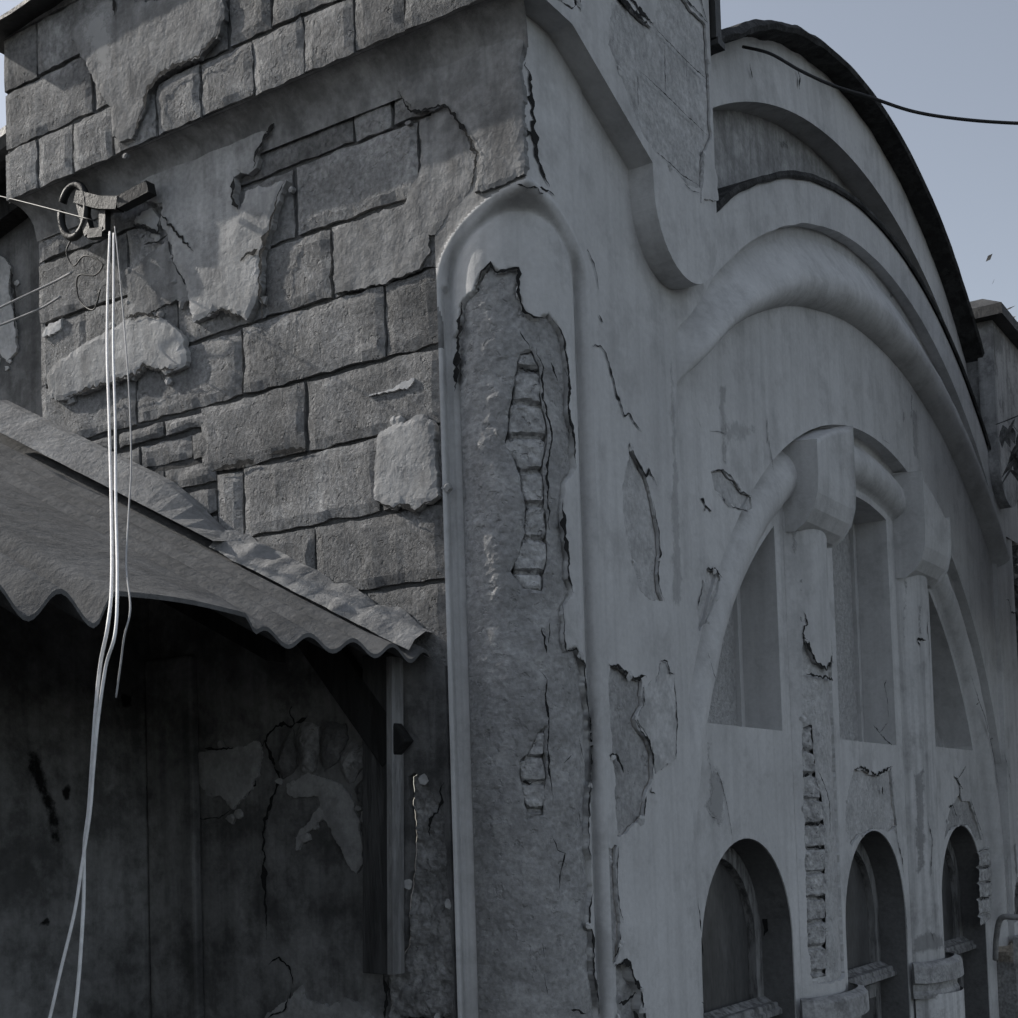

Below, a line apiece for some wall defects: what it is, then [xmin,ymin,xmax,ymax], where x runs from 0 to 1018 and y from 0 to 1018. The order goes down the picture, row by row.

peeling [0,256,20,371]
peeling [71,0,229,160]
peeling [42,123,296,405]
peeling [333,38,530,295]
spalling [608,0,719,203]
spalling [369,261,600,1018]
damp [28,752,70,842]
spalling [265,772,455,1018]
spalling [609,848,646,1018]
spalling [608,660,677,836]
spalling [799,613,895,984]
flaking render [945,776,992,925]